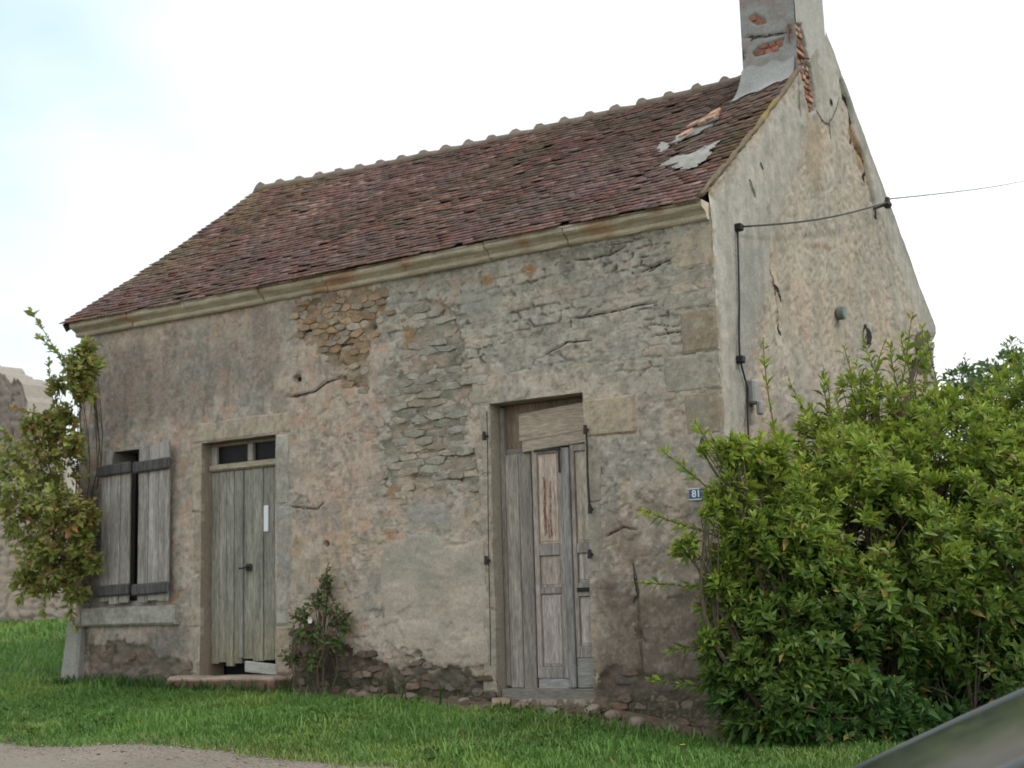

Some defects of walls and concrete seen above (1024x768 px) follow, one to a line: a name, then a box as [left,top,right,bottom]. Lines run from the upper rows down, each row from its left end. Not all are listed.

spalling [744,23,813,112]
peeling [656,108,721,170]
peeling [284,289,396,357]
flaking render [389,305,458,357]
crack [770,270,781,335]
crack [291,343,361,398]
flaking render [386,366,480,499]